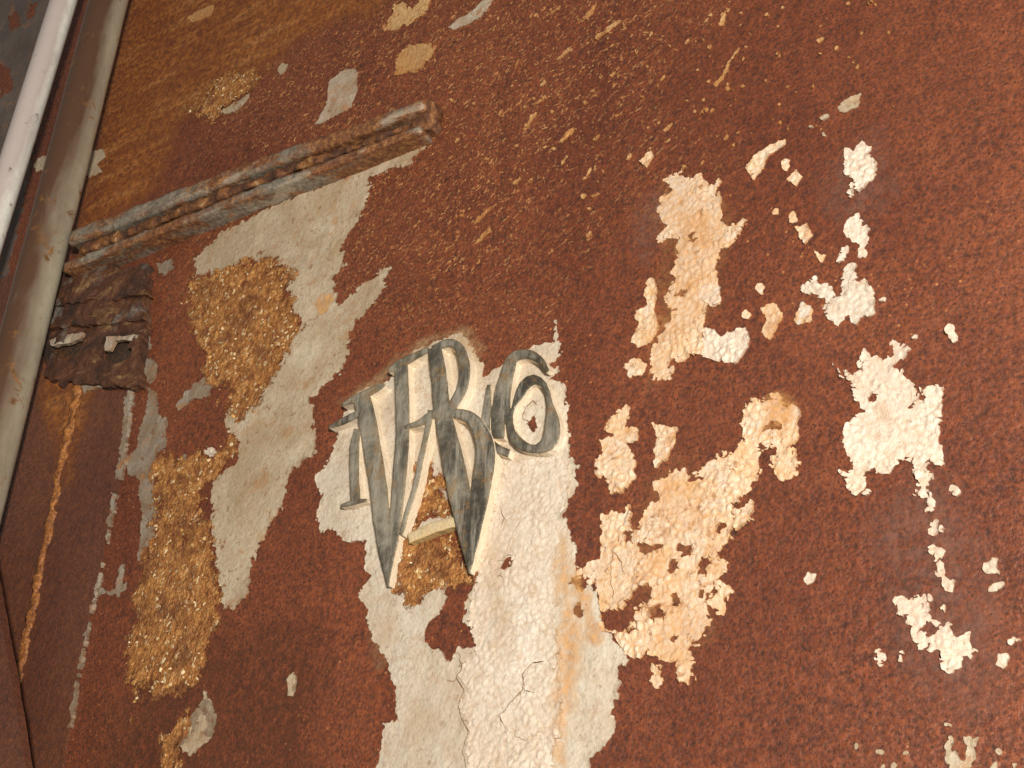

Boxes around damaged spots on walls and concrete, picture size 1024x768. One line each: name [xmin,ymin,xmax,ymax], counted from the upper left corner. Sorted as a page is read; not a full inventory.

peeling [383,0,431,32]
rust [81,0,380,225]
rust [82,126,405,255]
peeling [745,119,803,186]
peeling [843,141,878,198]
peeling [623,160,887,381]
peeling [944,323,958,343]
rust [122,250,333,768]
rust [391,459,478,609]
peeling [193,146,802,768]
peeling [832,334,979,675]
peeling [982,557,1005,593]